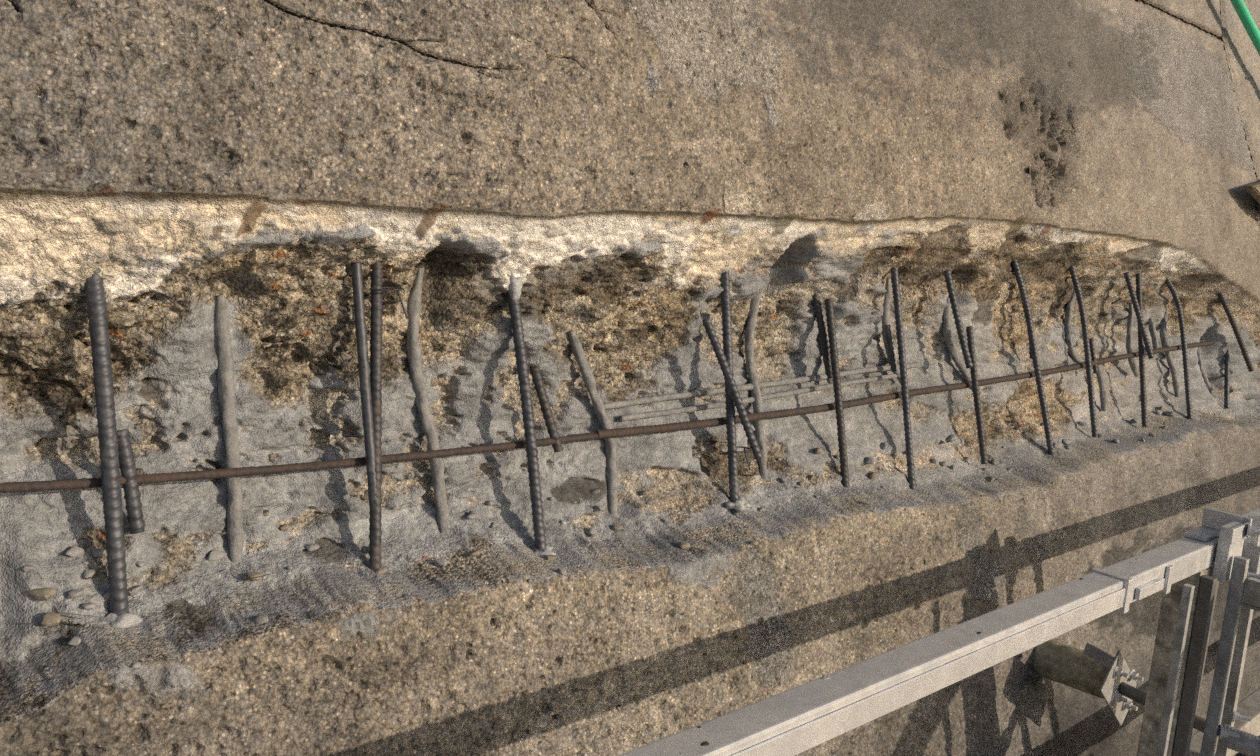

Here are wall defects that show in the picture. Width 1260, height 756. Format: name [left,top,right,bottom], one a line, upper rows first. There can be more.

crack [264,0,504,79]
spalling [0,187,1260,723]